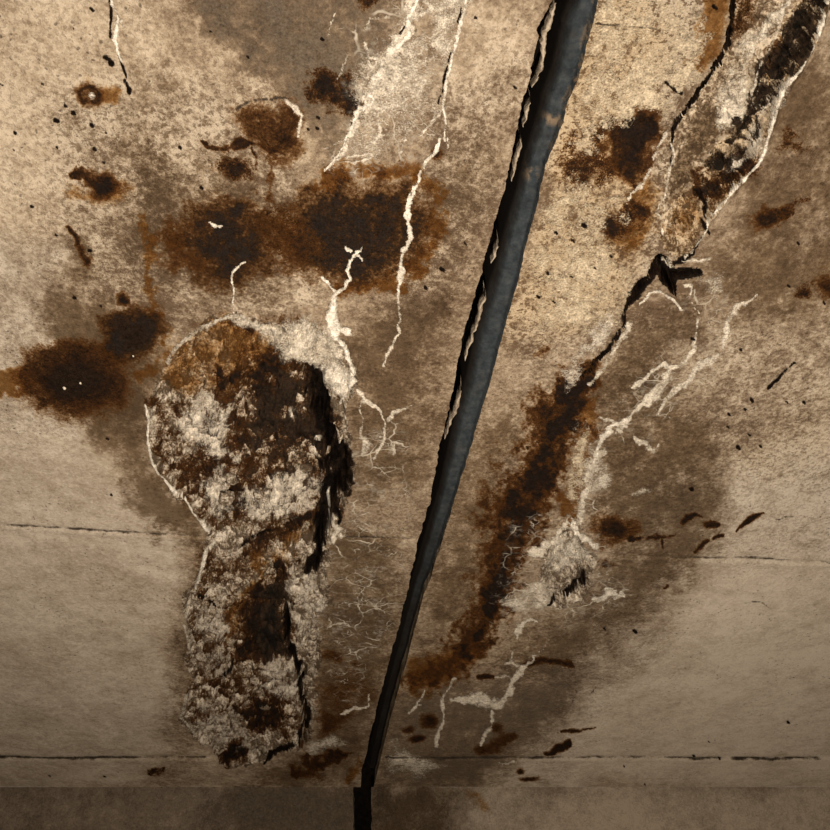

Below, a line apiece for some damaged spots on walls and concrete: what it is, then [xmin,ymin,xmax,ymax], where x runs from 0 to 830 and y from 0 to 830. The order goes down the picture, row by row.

crack [108,0,132,95]
water stain [255,0,466,174]
rust [158,169,439,292]
crack [382,0,472,367]
rust [557,109,663,242]
crack [580,0,737,386]
rust [12,293,165,421]
water stain [570,272,758,530]
crack [767,362,796,390]
spalling [143,311,363,769]
rust [400,360,602,694]
water stain [434,645,546,765]